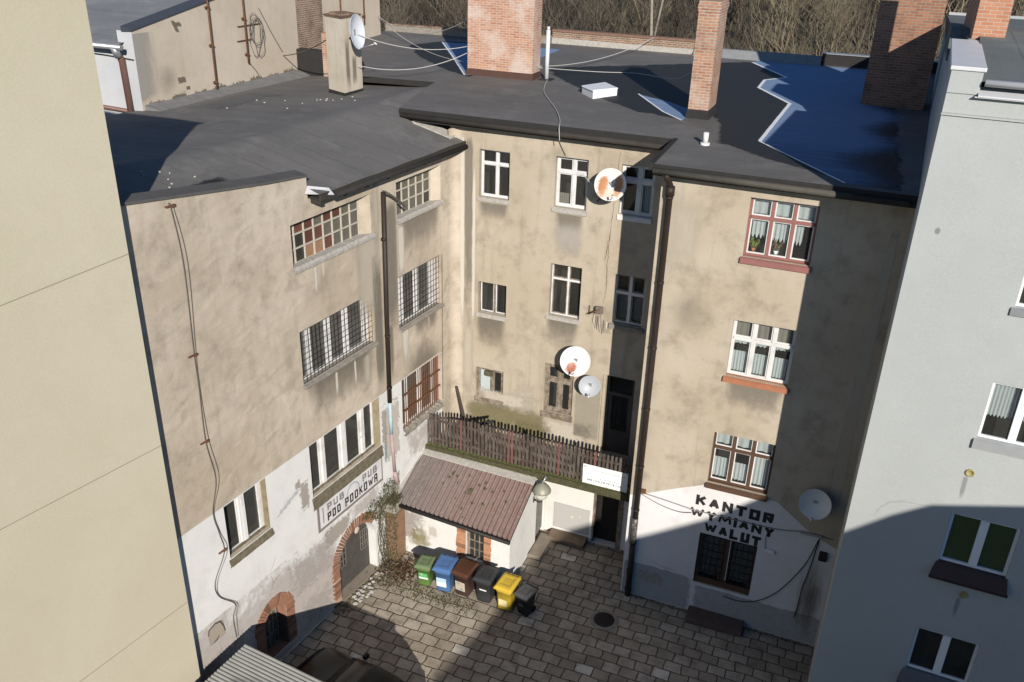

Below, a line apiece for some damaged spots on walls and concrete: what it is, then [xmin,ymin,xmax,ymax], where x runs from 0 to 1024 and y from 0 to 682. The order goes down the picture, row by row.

leakage [317,186,436,394]
leakage [461,136,589,445]
peeling [195,490,376,682]
peeling [295,480,309,508]
leakage [622,560,820,645]